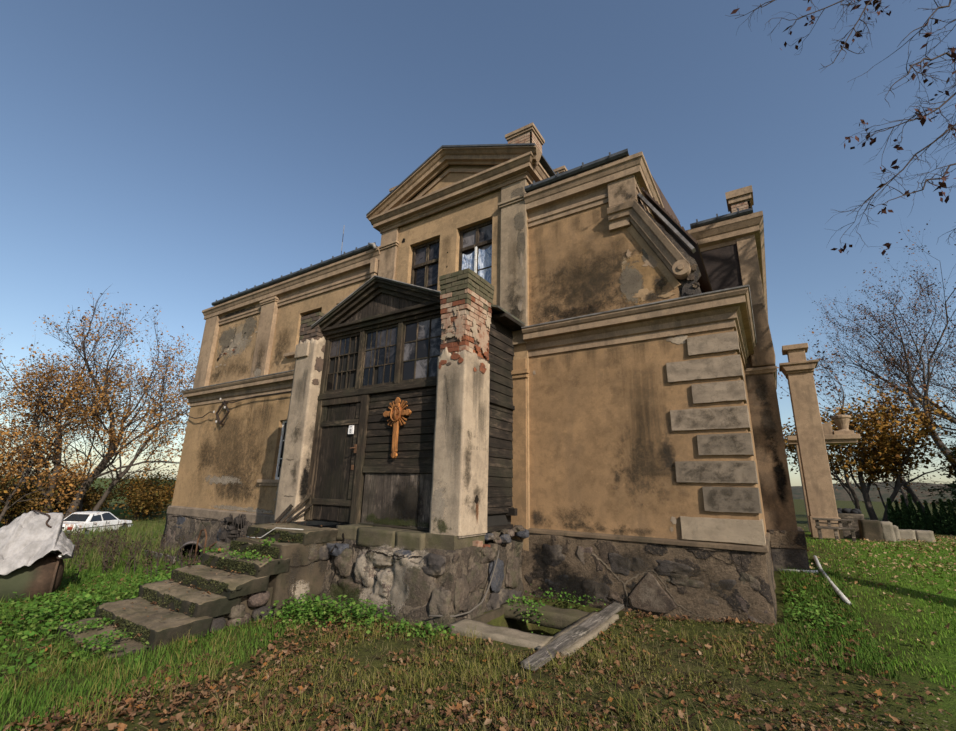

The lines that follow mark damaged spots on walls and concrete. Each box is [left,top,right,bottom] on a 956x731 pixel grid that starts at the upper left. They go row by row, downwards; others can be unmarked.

peeling [619,243,700,306]
peeling [215,317,258,368]
peeling [439,306,491,373]
leakage [201,443,273,513]